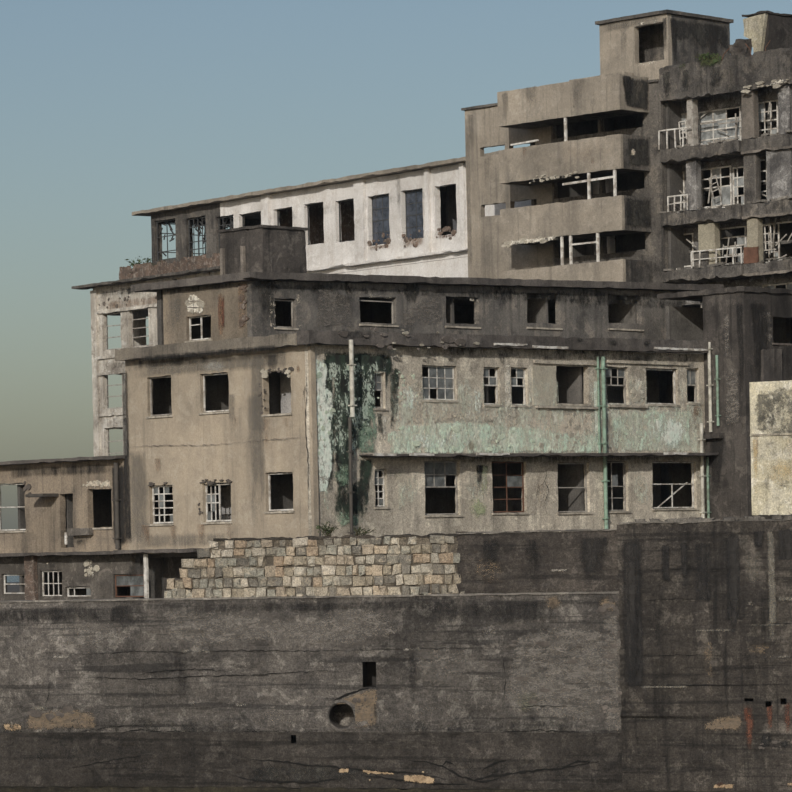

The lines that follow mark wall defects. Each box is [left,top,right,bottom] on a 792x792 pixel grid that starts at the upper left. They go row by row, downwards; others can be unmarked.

spalling [741,79,789,93]
rust [367,233,391,251]
rust [402,230,422,248]
rust [436,226,456,240]
spalling [501,235,558,248]
leakage [378,368,399,433]
peeling [381,364,702,454]
leakage [755,389,792,438]
leakage [323,360,349,502]
leakage [358,459,372,509]
crack [237,758,599,785]
spalling [404,771,434,784]